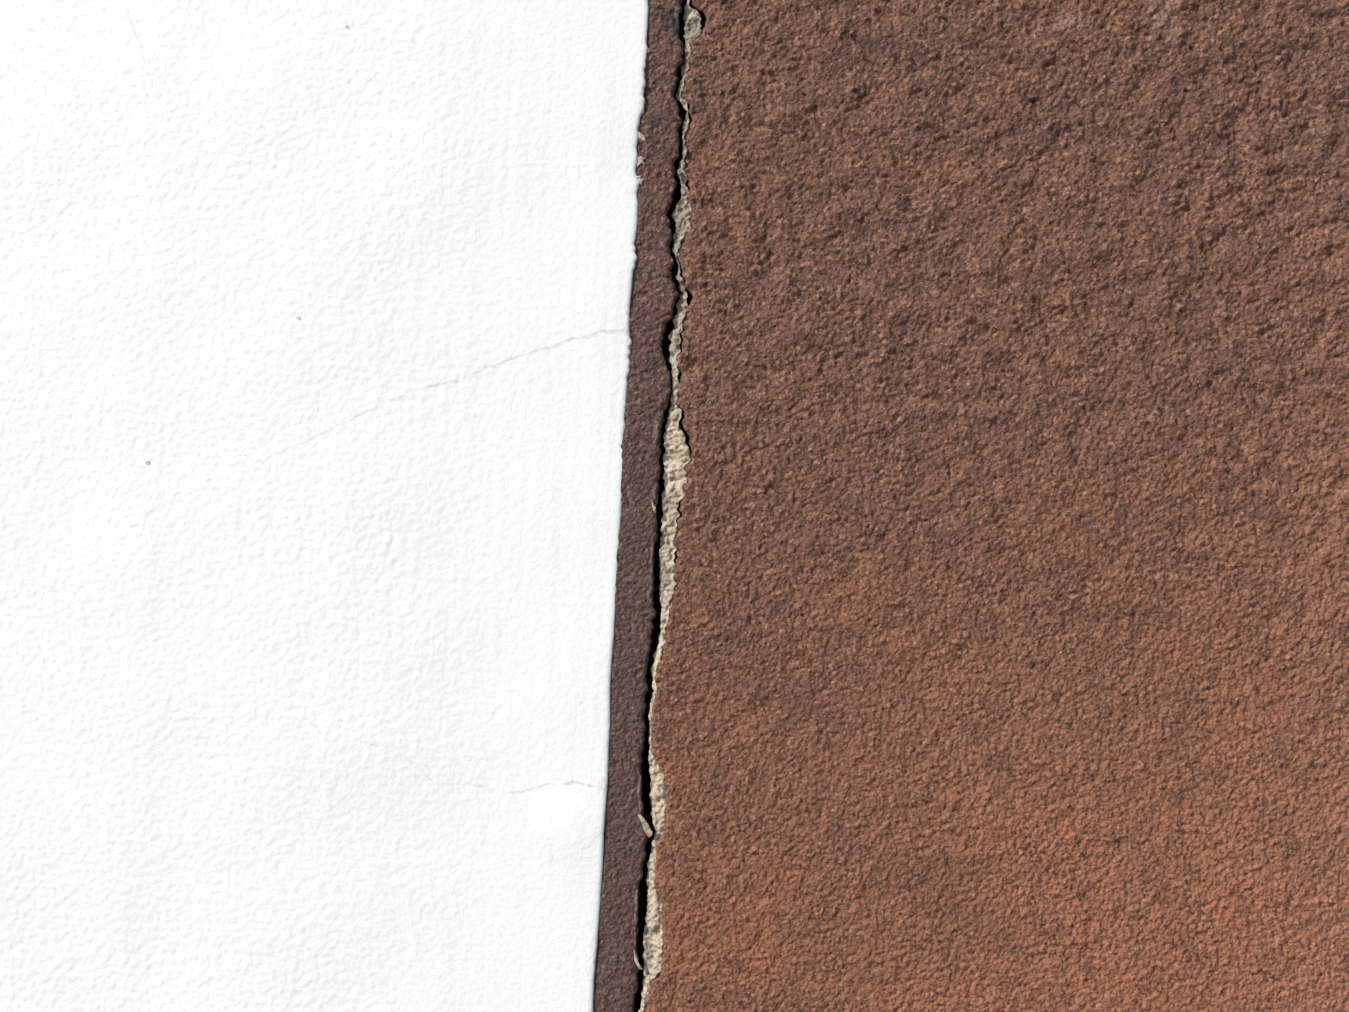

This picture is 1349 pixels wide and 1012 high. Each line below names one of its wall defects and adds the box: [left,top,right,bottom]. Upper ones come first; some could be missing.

crack [633,0,706,1012]